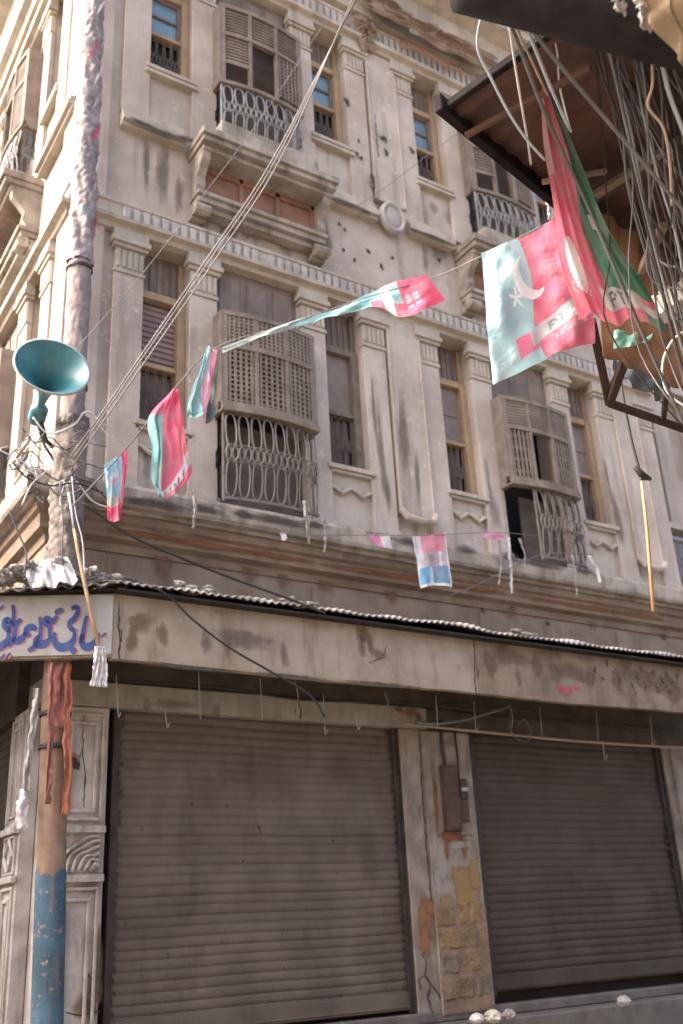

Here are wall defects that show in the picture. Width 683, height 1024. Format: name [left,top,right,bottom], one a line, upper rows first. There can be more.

water stain [144,150,182,203]
crack [115,602,123,659]
water stain [127,616,166,649]
water stain [358,628,384,658]
water stain [486,647,594,685]
crack [78,726,86,807]
spalling [418,840,495,1014]
crack [419,954,441,1012]